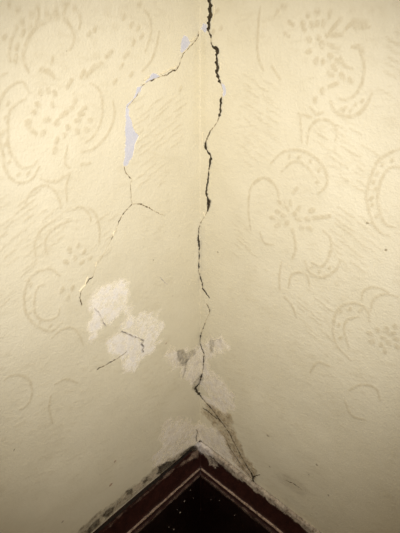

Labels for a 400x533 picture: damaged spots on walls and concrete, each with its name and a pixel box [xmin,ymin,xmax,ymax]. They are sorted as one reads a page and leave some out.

peeling [124,73,159,166]
crack [79,166,165,305]
crack [127,0,260,482]